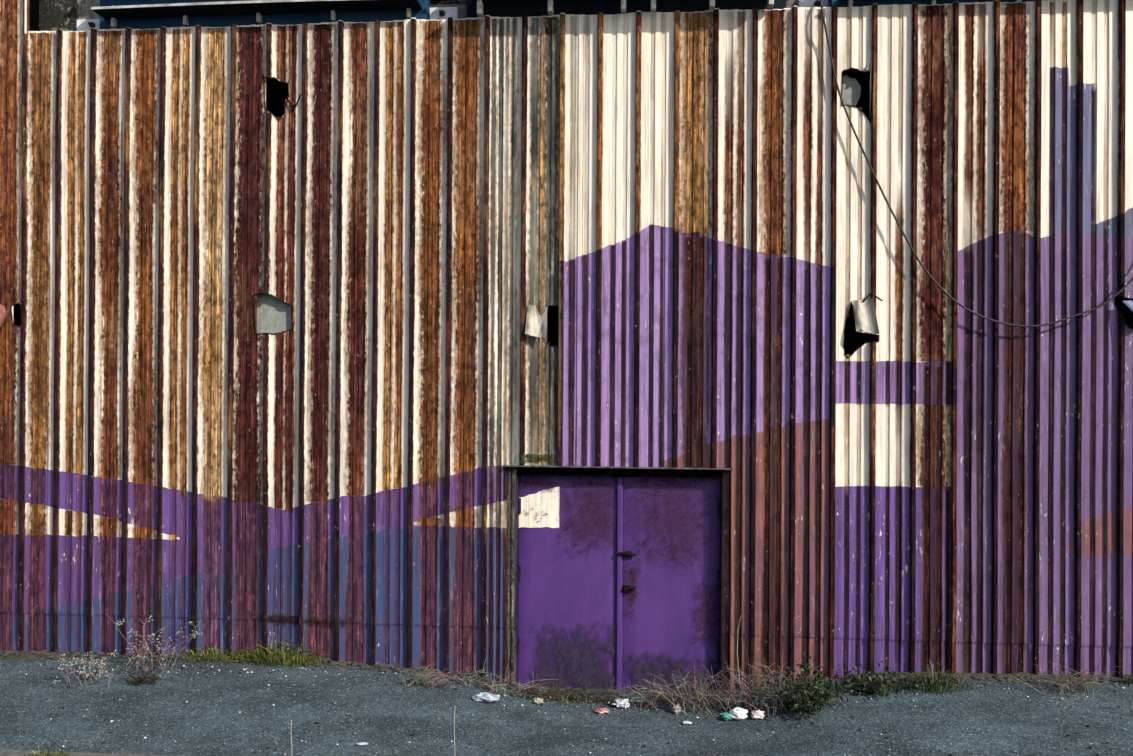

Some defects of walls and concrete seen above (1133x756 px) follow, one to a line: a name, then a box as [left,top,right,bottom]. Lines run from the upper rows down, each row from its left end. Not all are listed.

corrosion [0,0,876,694]
corrosion [870,4,878,311]
corrosion [885,0,1133,681]